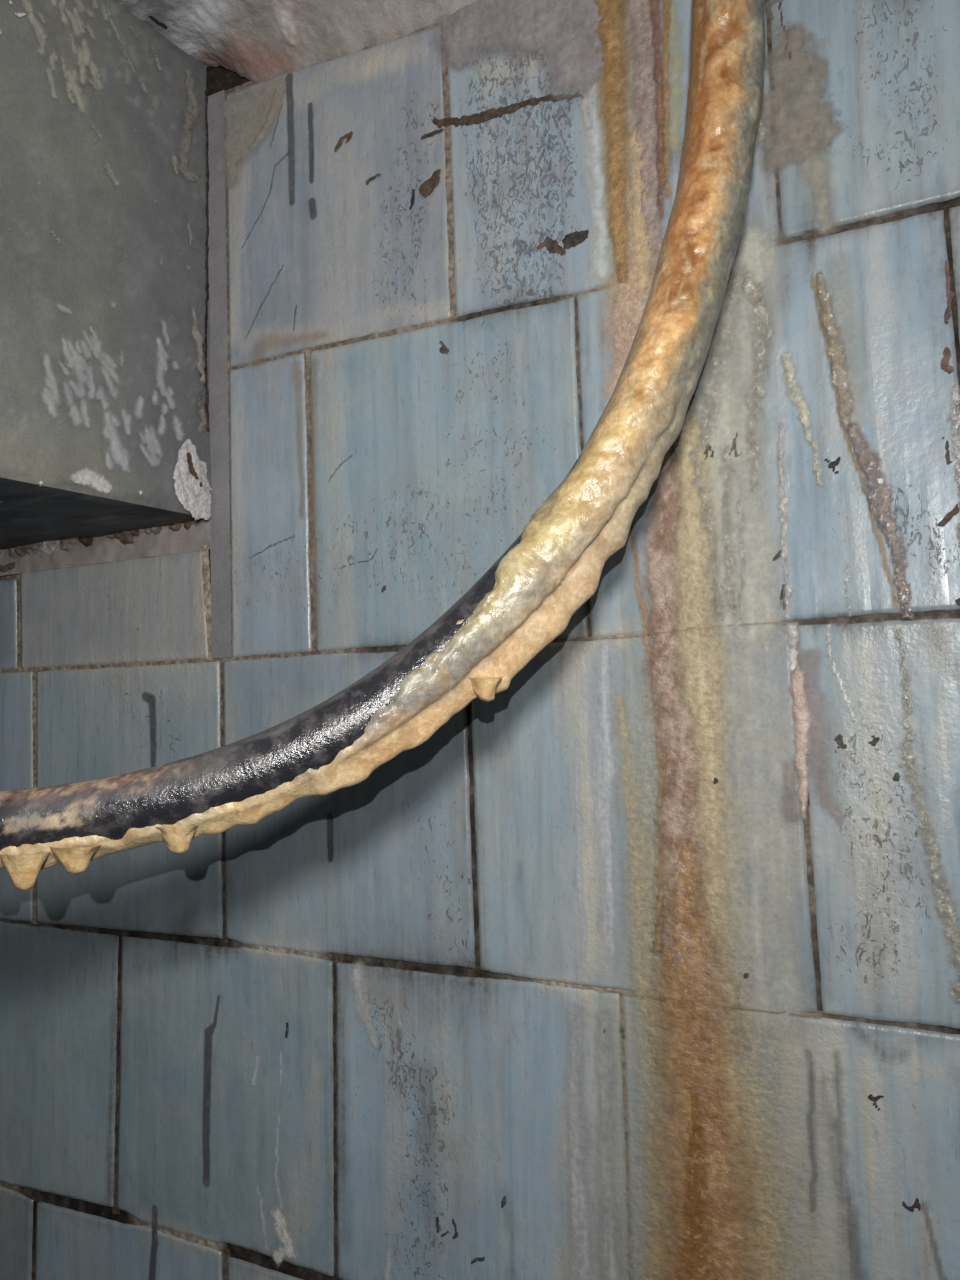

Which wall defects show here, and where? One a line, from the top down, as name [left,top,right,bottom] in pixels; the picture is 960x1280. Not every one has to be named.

peeling [0,321,212,572]
peeling [191,308,205,382]
water stain [0,0,866,1031]
corrosion [596,0,682,398]
water stain [811,260,960,1003]
water stain [351,963,377,1047]
corrosion [618,398,820,1280]